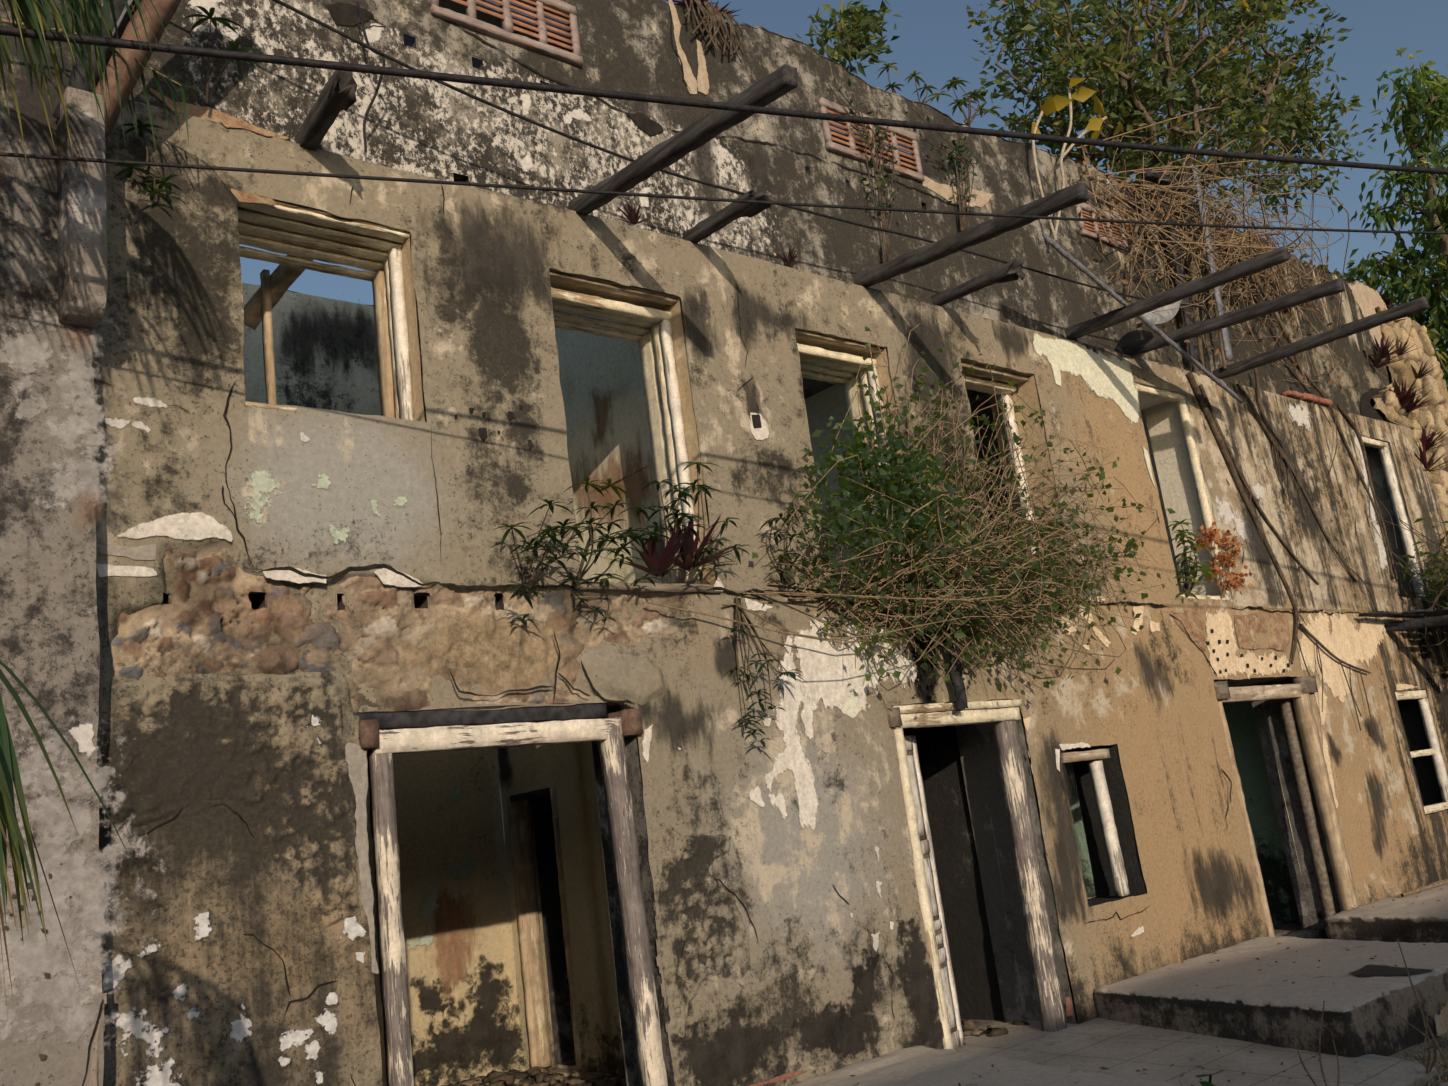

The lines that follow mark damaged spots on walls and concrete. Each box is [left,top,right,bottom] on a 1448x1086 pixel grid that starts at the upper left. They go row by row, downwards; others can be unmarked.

peeling [1033,333,1140,424]
crack [168,380,584,593]
peeling [1143,447,1155,486]
flaking render [96,512,688,713]
crack [448,629,635,704]
peeling [749,618,919,830]
peeling [1131,604,1387,809]
water stain [192,912,213,941]
water stain [340,911,367,963]
water stain [110,1006,182,1086]
water stain [278,992,338,1084]
water stain [659,916,948,1086]